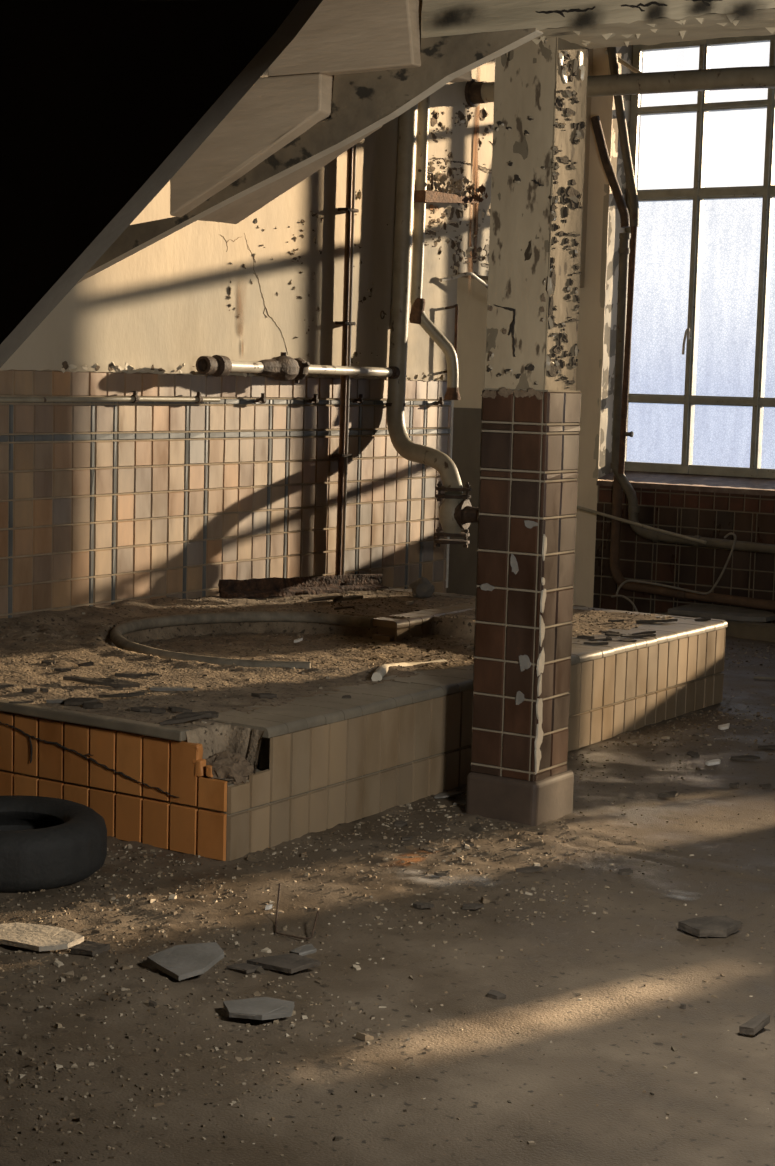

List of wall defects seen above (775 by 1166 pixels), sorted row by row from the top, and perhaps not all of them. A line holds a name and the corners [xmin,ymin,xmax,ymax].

peeling [674,14,740,40]
peeling [427,103,534,187]
peeling [425,203,490,275]
spalling [481,24,659,400]
crack [221,235,288,355]
crack [0,722,179,798]